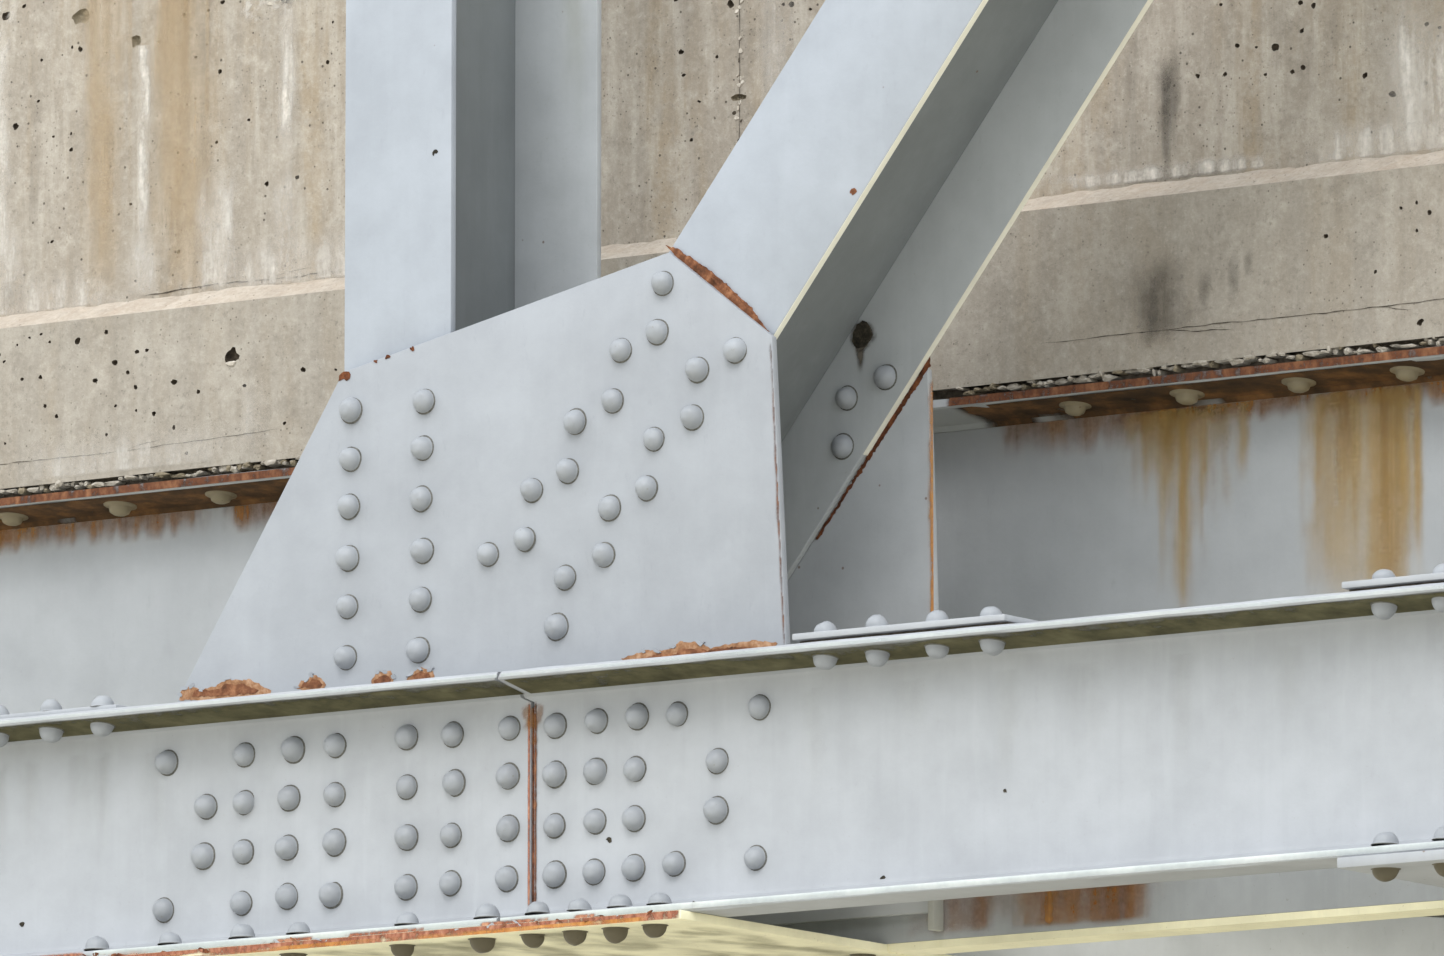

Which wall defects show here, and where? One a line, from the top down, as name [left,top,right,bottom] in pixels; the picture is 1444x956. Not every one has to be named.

rust [666,245,769,332]
crack [1040,298,1444,344]
rust [0,467,295,546]
rust [773,407,785,638]
rust [815,346,1444,612]
rust [43,703,679,956]